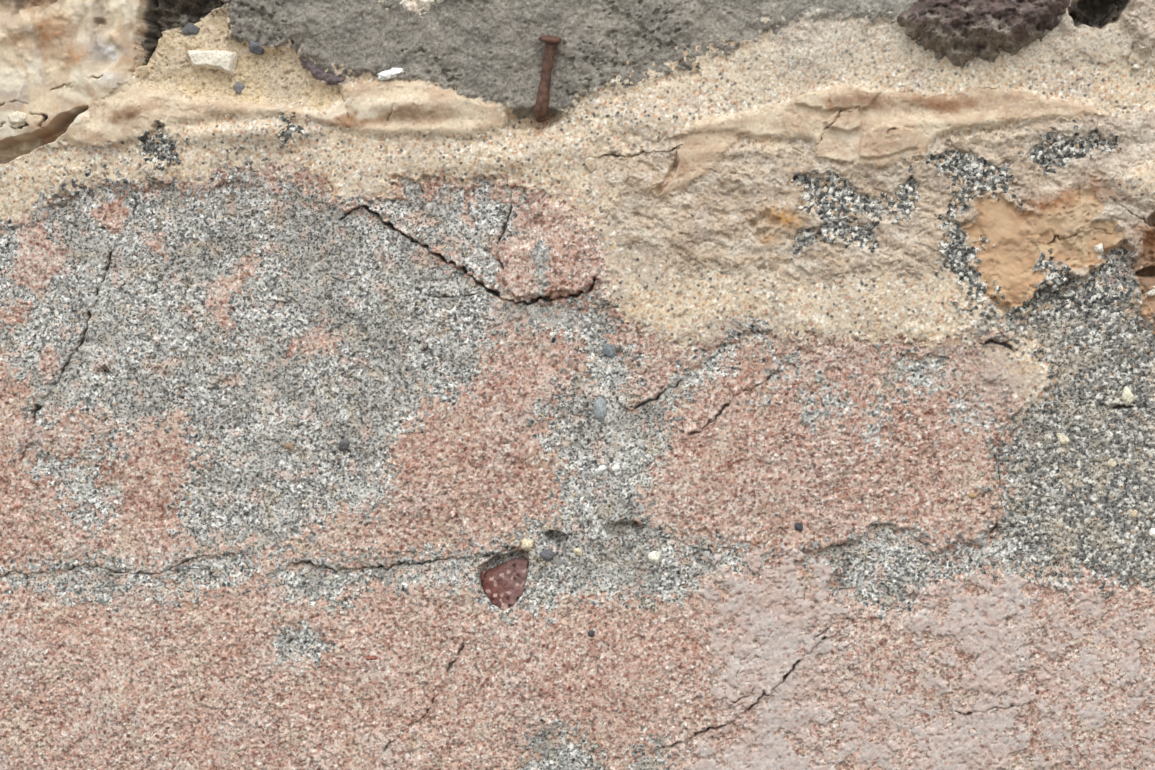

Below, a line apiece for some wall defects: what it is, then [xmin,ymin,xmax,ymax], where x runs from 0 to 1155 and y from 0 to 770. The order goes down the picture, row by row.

spalling [128,0,227,74]
spalling [187,50,238,76]
spalling [1069,0,1136,32]
spalling [136,119,183,171]
crack [340,193,598,306]
crack [0,198,137,473]
spalling [0,157,507,607]
crack [616,374,689,412]
spalling [273,84,1155,770]
crack [680,344,811,445]
crack [0,554,213,579]
crack [276,530,531,577]